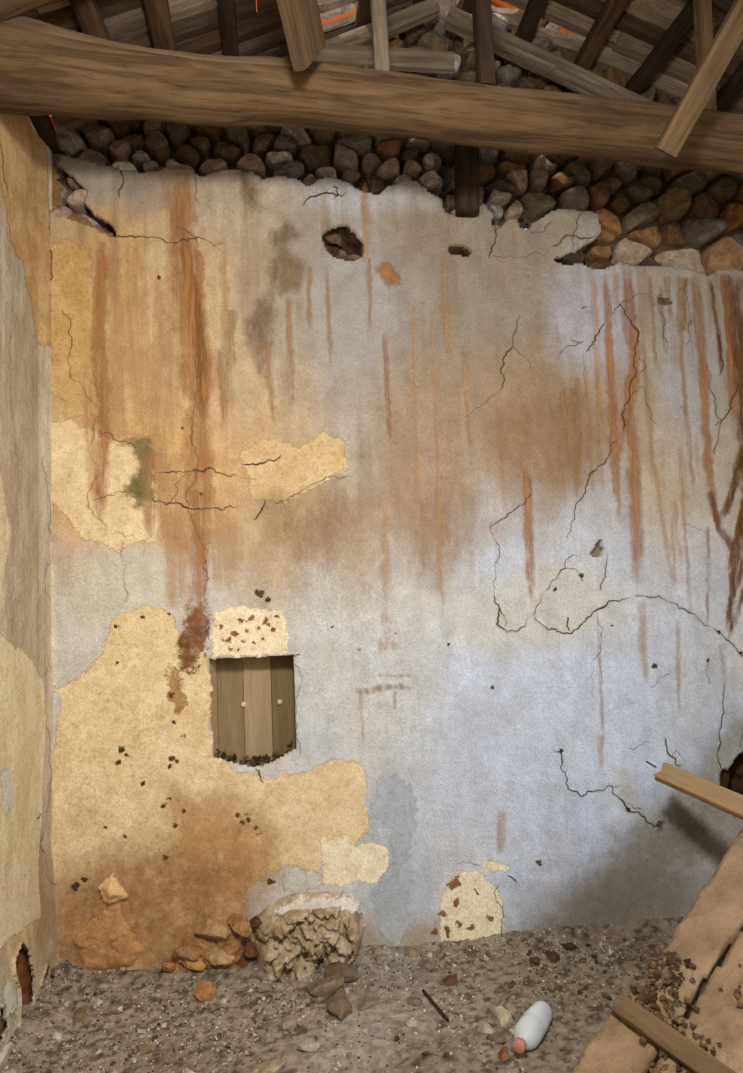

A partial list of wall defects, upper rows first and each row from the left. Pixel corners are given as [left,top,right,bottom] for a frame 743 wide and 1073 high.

corrosion [164,183,211,714]
spalling [0,113,455,553]
spalling [479,153,743,276]
crack [490,280,743,658]
corrosion [604,285,641,564]
corrosion [682,277,743,631]
peeling [0,589,390,1035]
peeling [430,858,510,942]
crack [554,751,654,827]
crack [665,738,681,766]
crack [706,663,742,785]
spalling [720,751,743,795]